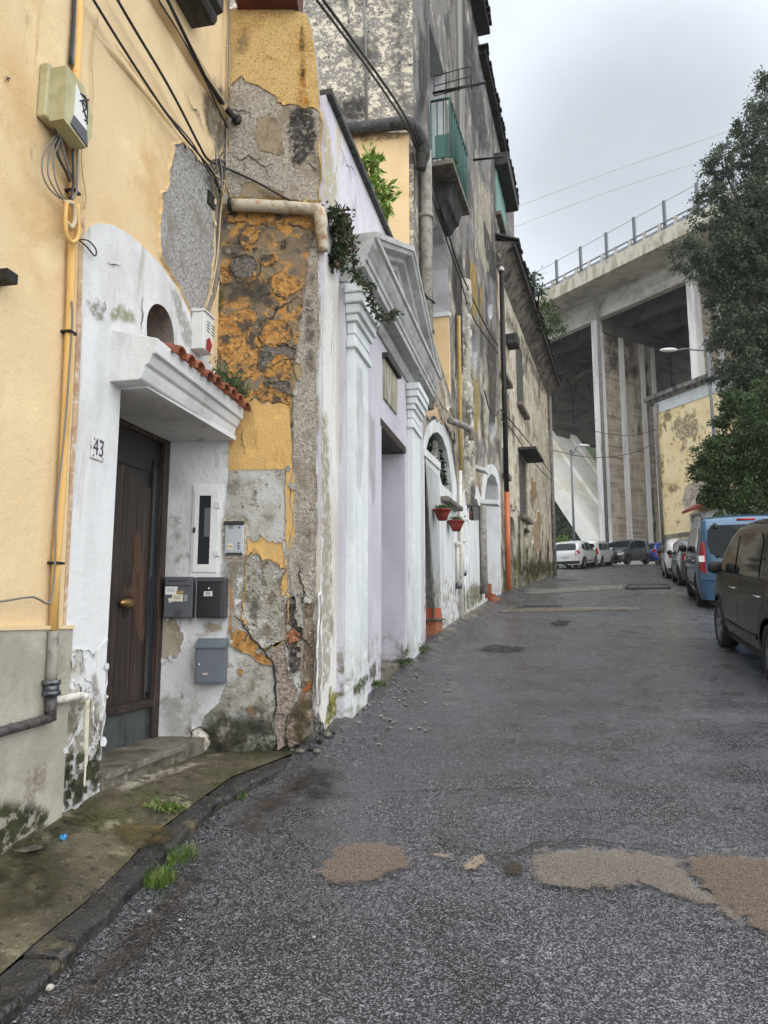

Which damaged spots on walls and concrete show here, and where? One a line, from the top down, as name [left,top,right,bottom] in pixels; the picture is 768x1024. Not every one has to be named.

water stain [393,0,405,70]
water stain [288,107,337,211]
water stain [340,98,365,119]
spalling [157,75,324,751]
water stain [518,516,549,576]
spalling [63,637,109,754]
crack [234,616,287,737]